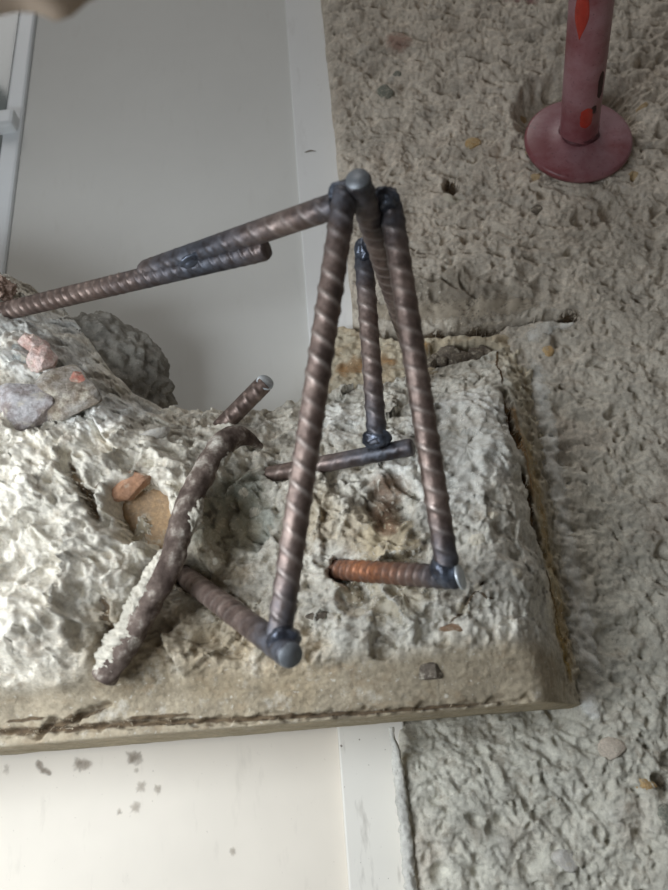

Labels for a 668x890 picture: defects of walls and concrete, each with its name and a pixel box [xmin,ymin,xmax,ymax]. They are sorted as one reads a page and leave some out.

crack [559,312,577,323]
corrosion [338,359,362,373]
spalling [0,364,103,431]
crack [424,328,521,450]
spalling [440,416,500,488]
corrosion [374,478,400,535]
corrosion [92,425,263,686]
spalling [357,521,421,563]
spalling [305,582,429,627]
crack [450,582,494,622]
spalling [419,662,443,680]
crack [0,703,488,736]